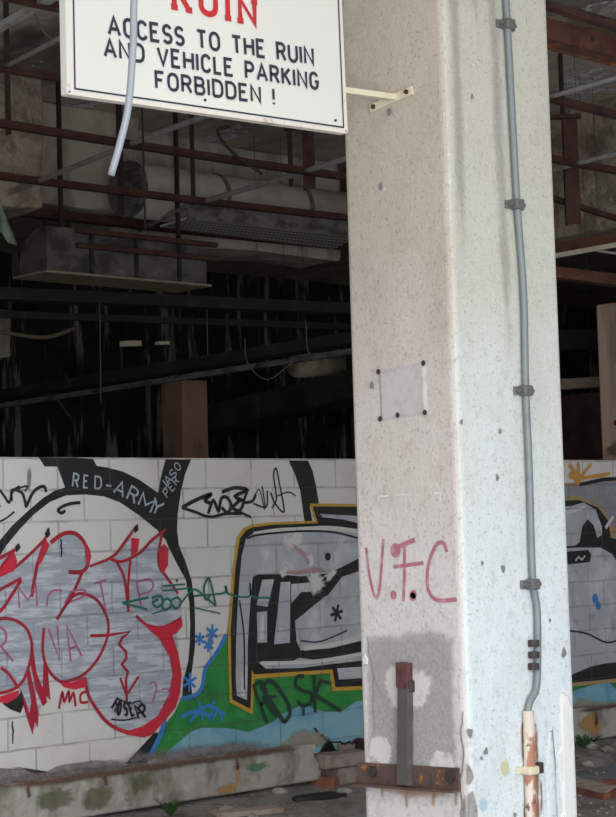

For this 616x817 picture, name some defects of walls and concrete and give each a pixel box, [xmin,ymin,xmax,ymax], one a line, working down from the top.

spalling [460,764,483,817]